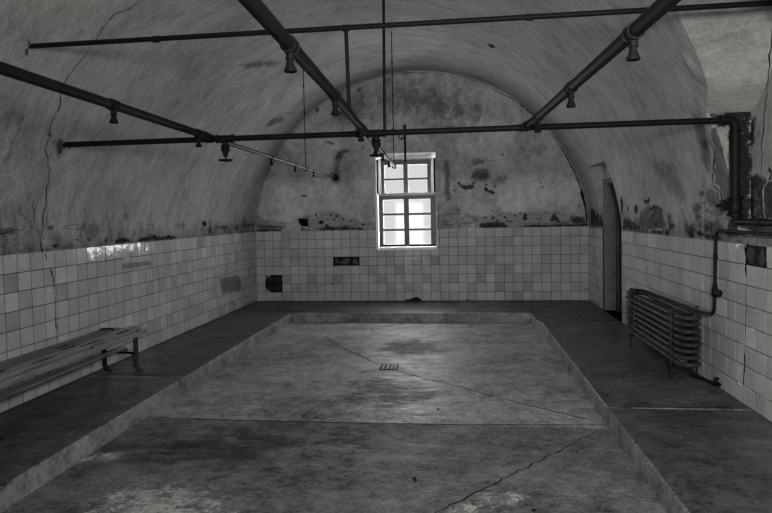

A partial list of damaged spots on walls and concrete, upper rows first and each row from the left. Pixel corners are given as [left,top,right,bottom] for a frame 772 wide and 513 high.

crack [750,33,772,184]
crack [20,0,138,335]
spalling [693,127,730,231]
water stain [724,112,766,219]
peeling [260,212,365,228]
peeling [443,209,573,225]
spalling [634,198,667,231]
peeling [333,256,360,267]
peeling [746,244,767,269]
peeling [265,275,283,292]
crack [311,329,605,513]